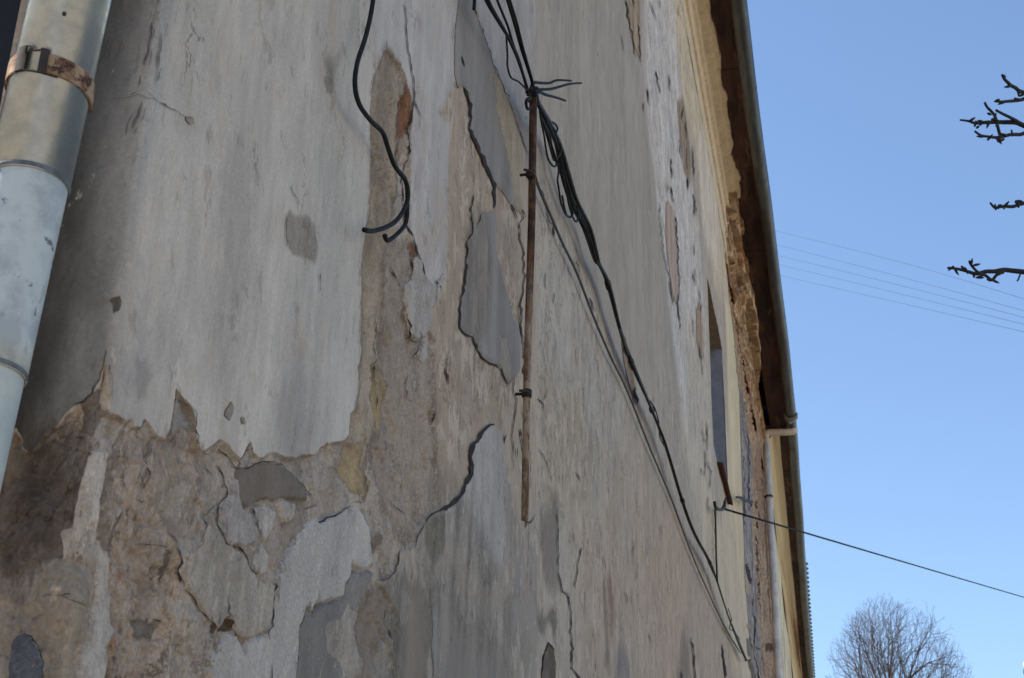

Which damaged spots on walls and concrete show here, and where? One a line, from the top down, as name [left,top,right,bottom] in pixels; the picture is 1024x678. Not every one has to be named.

peeling [621,0,661,60]
peeling [493,73,524,218]
peeling [657,99,704,375]
flaking render [0,45,447,678]
flaking render [725,191,775,678]
flaking render [539,611,557,678]
crack [525,516,606,678]